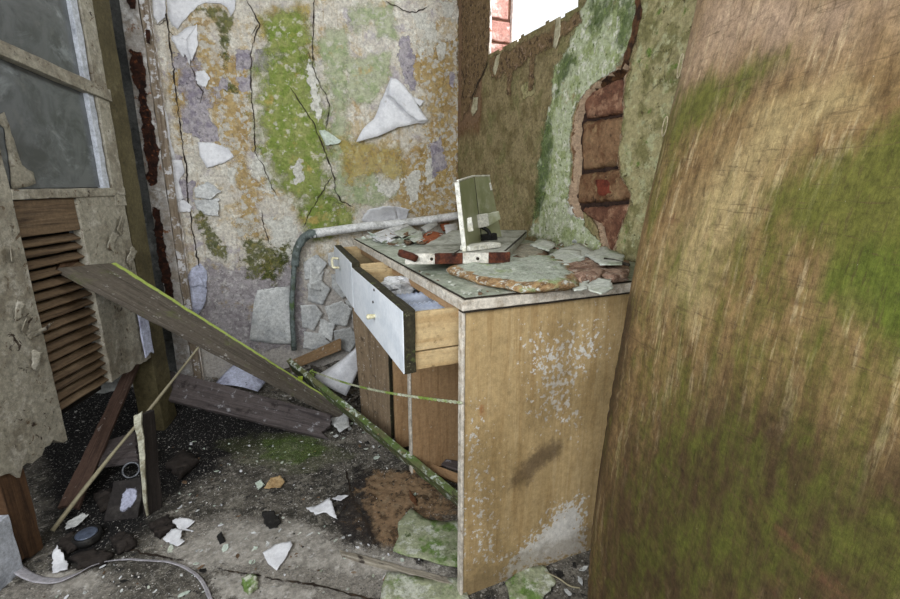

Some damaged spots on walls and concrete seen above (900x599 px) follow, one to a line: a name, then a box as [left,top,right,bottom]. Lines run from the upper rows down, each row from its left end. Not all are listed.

corrosion [129,49,161,186]
crack [154,13,204,268]
spalling [152,0,278,200]
crack [247,1,277,242]
leakage [262,10,312,70]
crack [291,0,350,228]
peeling [356,0,454,142]
leakage [298,0,582,241]
spalling [577,77,630,250]
leakage [618,0,634,49]
corrosion [152,207,174,299]
peeling [250,286,291,344]